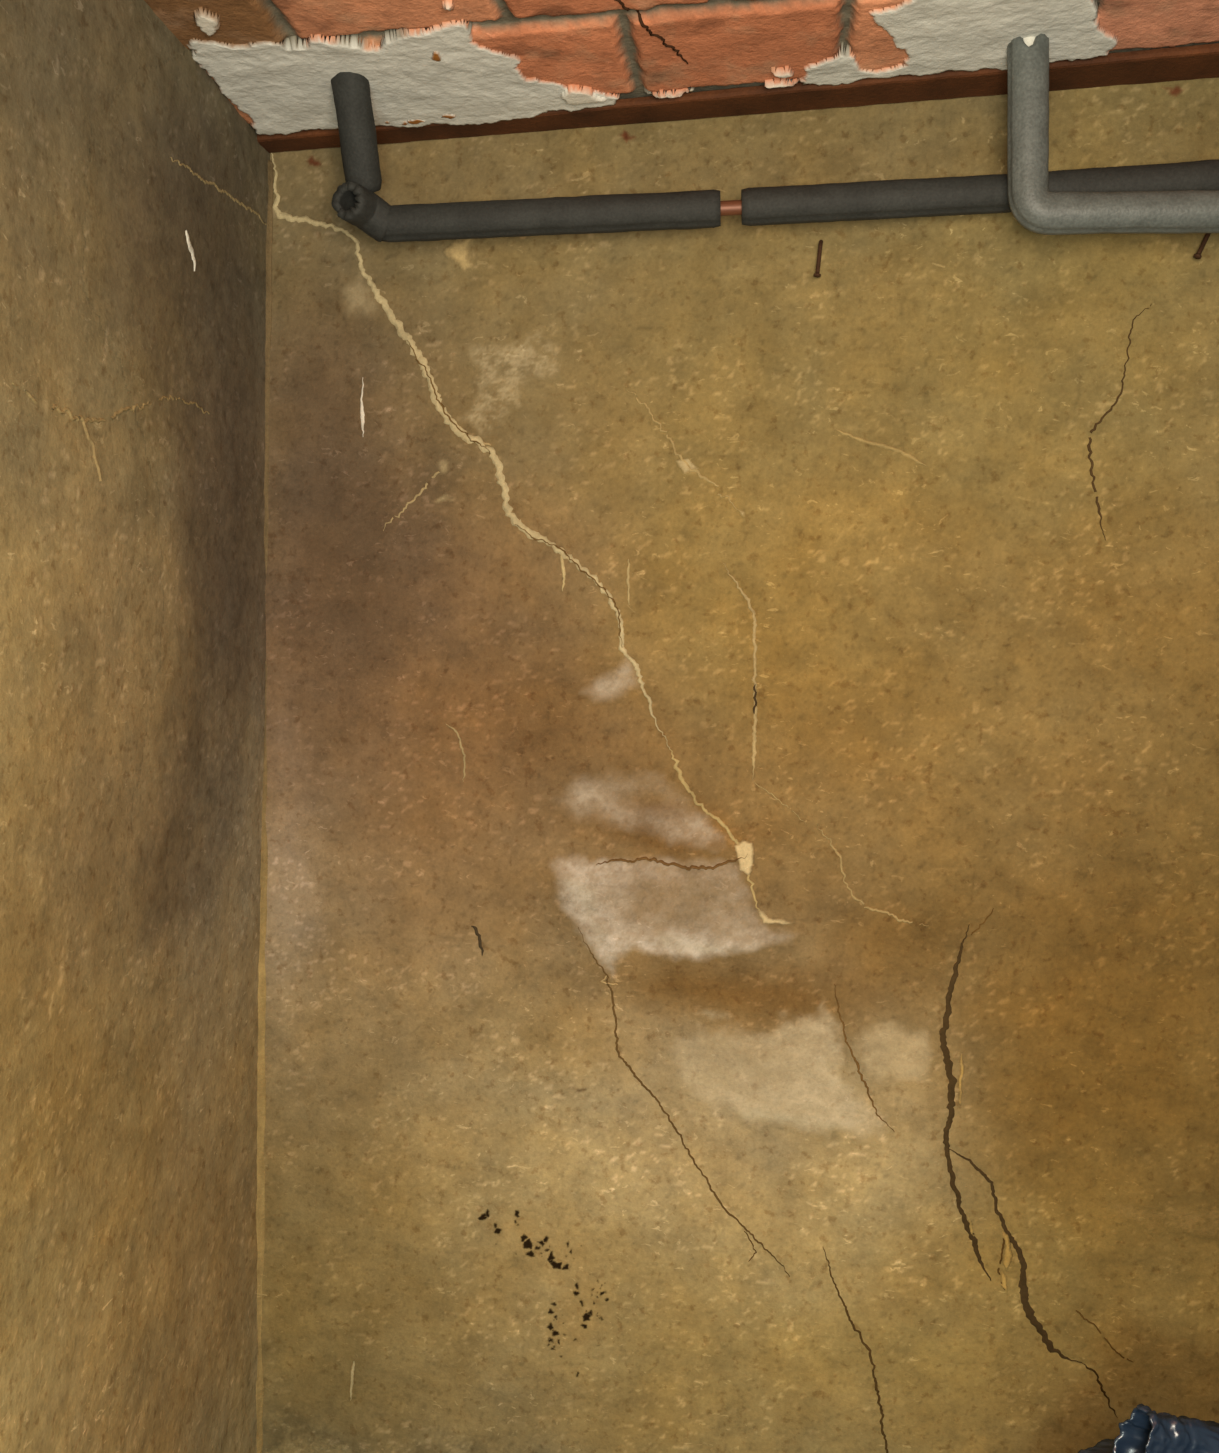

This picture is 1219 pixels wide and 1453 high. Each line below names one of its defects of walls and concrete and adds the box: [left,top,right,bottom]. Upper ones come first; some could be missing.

flaking render [185,0,620,135]
crack [615,0,688,64]
flaking render [644,87,695,99]
flaking render [765,0,1119,89]
crack [170,153,760,911]
water stain [578,649,644,705]
water stain [545,765,937,1147]
crack [578,927,790,1277]
crack [939,908,1134,1417]
crack [823,1248,888,1453]